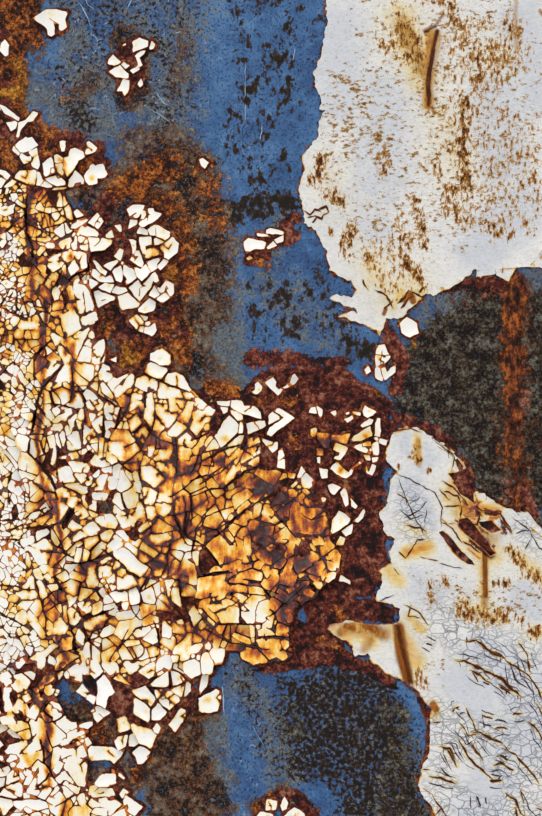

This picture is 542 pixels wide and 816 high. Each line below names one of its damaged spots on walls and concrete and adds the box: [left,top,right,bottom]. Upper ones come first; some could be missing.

peeling [108,37,156,96]
corrosion [312,62,414,183]
peeling [299,0,542,382]
corrosion [0,444,167,691]
corrosion [111,387,155,452]
crack [0,184,304,717]
peeling [0,104,366,816]
peeling [310,405,542,816]
crack [394,428,542,574]
corrosion [0,737,45,816]
crack [25,746,86,816]
crack [423,635,542,816]